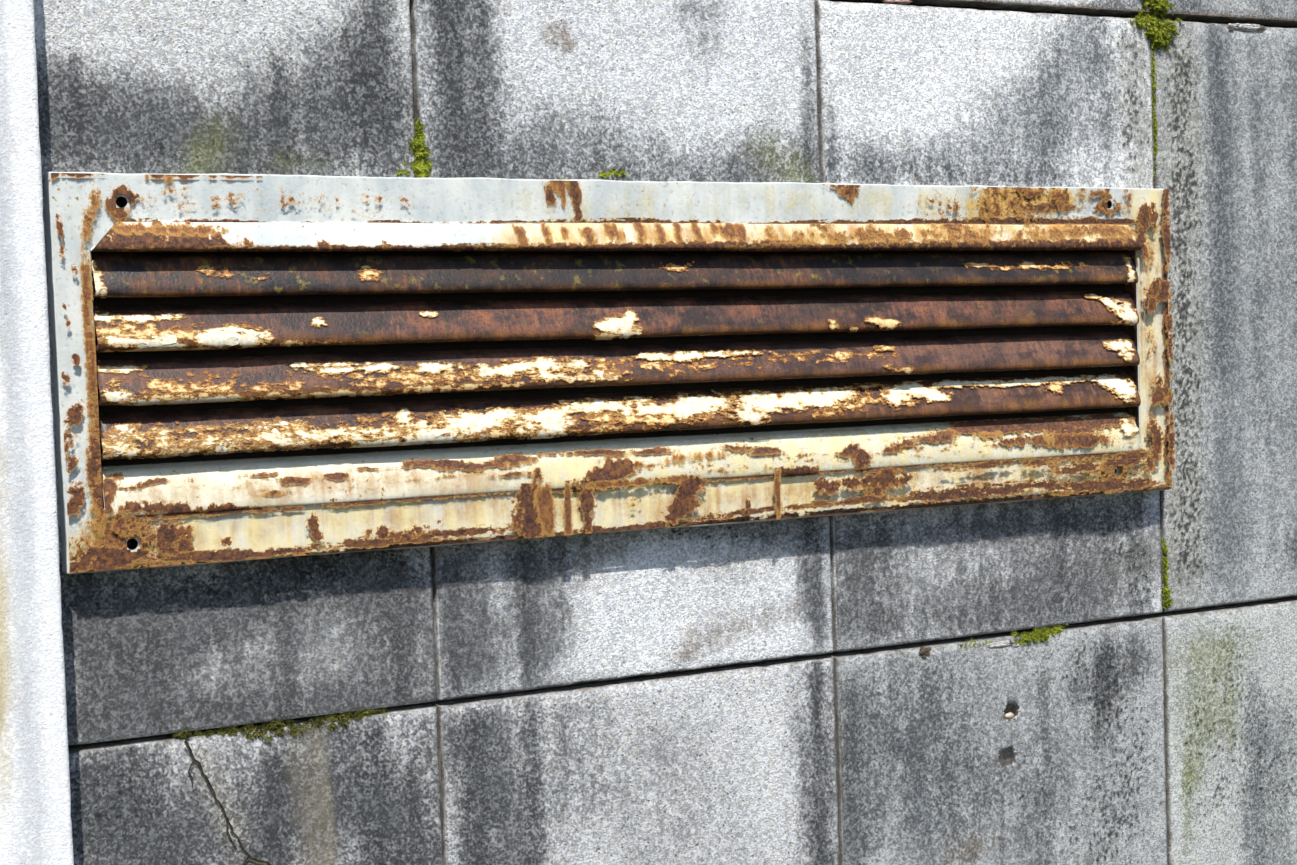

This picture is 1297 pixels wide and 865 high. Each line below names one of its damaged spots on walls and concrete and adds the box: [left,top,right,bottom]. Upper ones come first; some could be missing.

damp [37,0,410,177]
damp [422,0,1153,188]
rust [51,173,1176,573]
peeling [91,255,1140,460]
damp [1188,29,1246,581]
crack [184,741,271,865]
damp [60,548,544,865]
damp [504,537,591,680]
damp [798,662,954,865]
damp [1080,637,1147,739]